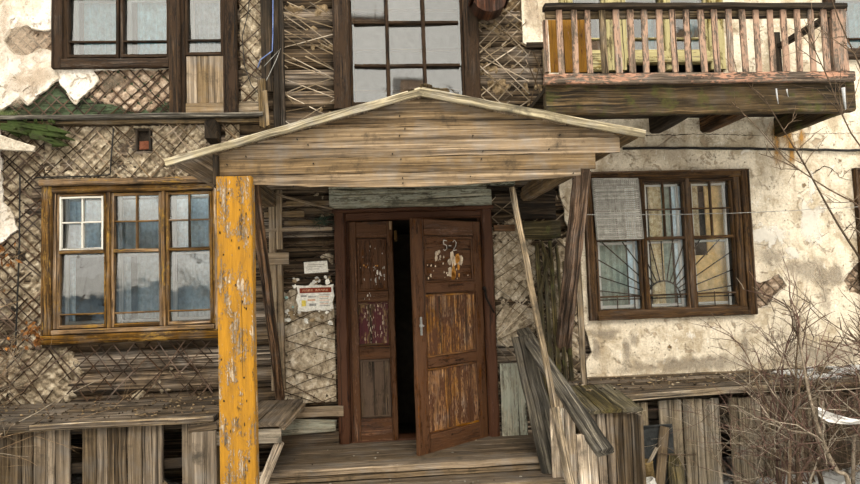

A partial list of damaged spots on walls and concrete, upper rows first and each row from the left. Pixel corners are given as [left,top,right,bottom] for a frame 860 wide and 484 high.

spalling [3,26,51,80]
spalling [221,123,241,142]
corrosion [772,129,804,162]
spalling [0,69,213,406]
spalling [756,273,787,308]
spalling [843,263,860,296]
leakage [665,357,725,370]